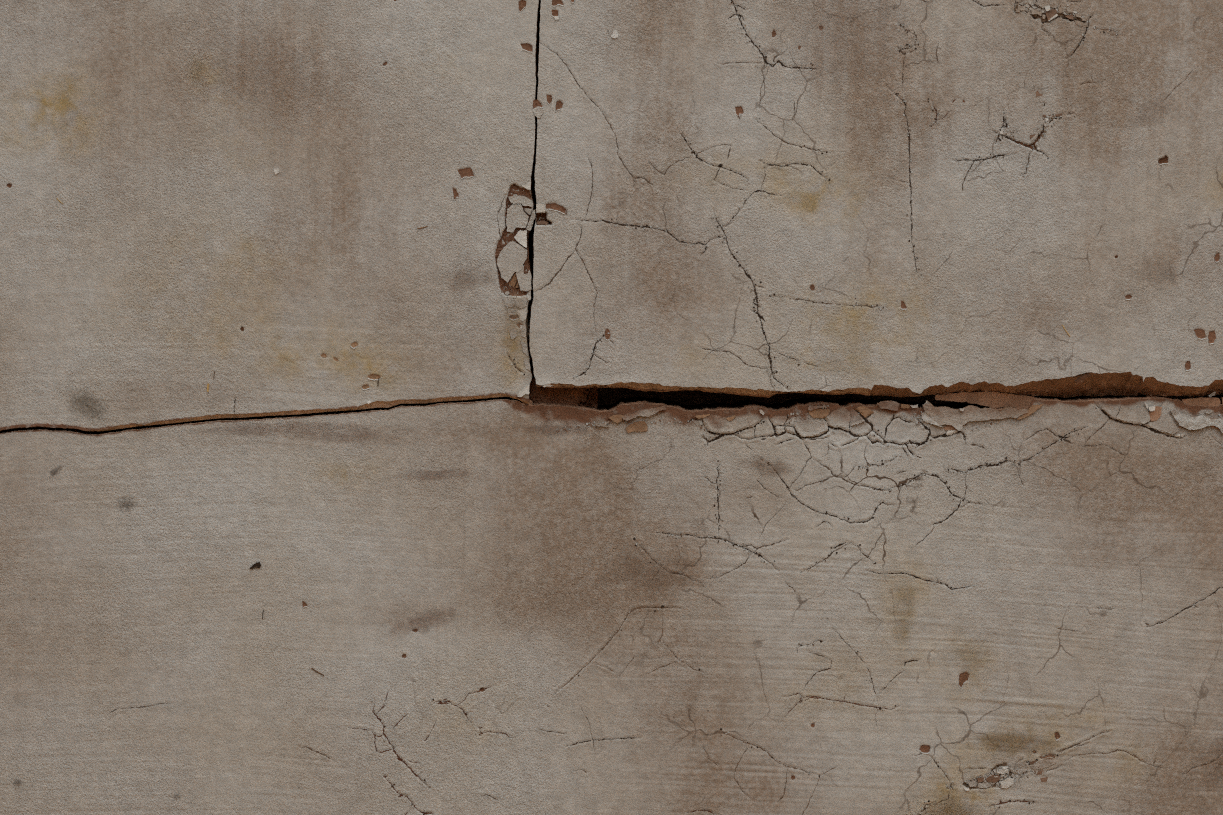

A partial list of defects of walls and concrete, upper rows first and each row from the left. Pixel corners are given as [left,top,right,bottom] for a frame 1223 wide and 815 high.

flaking render [495,180,567,371]
crack [0,0,1223,592]
crack [1145,587,1223,627]
crack [540,605,704,773]
crack [786,631,920,725]
crack [353,686,511,815]
crack [703,728,837,815]
crack [914,753,954,810]
crack [989,799,1034,808]
flaking render [948,732,1087,791]
crack [1056,732,1223,774]